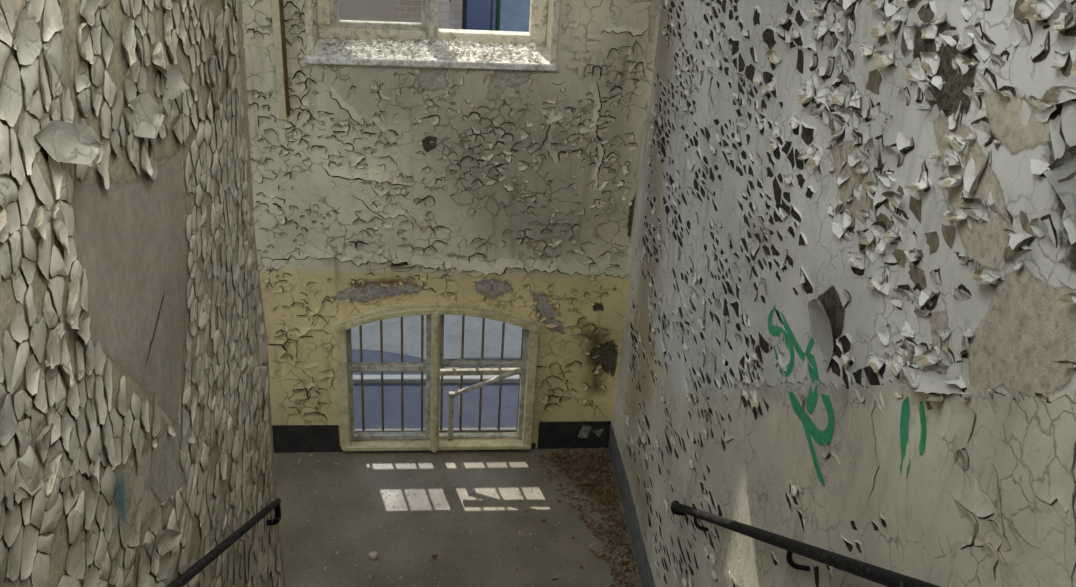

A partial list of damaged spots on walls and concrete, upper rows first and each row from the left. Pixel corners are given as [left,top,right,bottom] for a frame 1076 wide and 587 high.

crack [282,310,330,412]
peeling [0,0,644,587]
spalling [625,0,1076,587]
crack [705,376,1076,587]